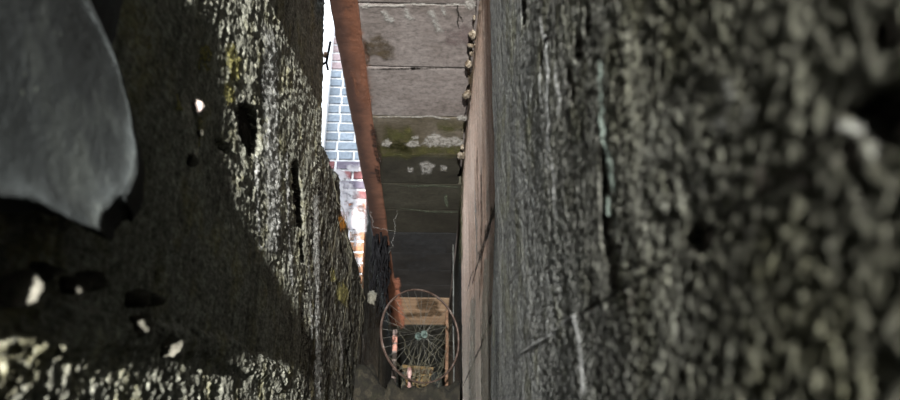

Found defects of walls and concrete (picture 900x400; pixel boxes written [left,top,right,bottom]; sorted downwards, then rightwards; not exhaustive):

water stain [364,36,392,64]
spalling [224,84,257,155]
corrosion [371,124,382,183]
water stain [380,115,466,151]